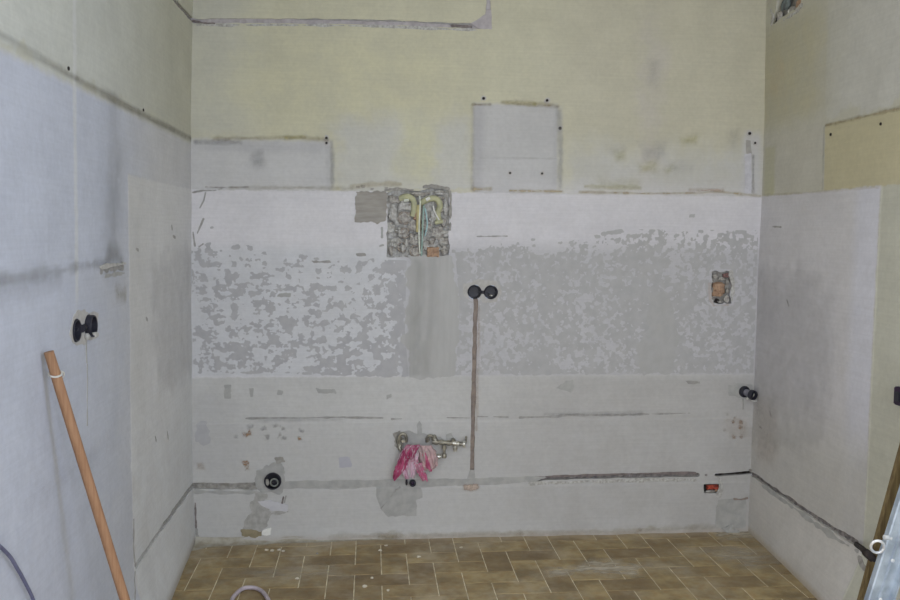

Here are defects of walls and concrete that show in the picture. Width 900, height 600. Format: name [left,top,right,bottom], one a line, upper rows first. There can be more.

spalling [770,0,803,26]
flaking render [191,184,758,393]
spalling [241,457,288,538]